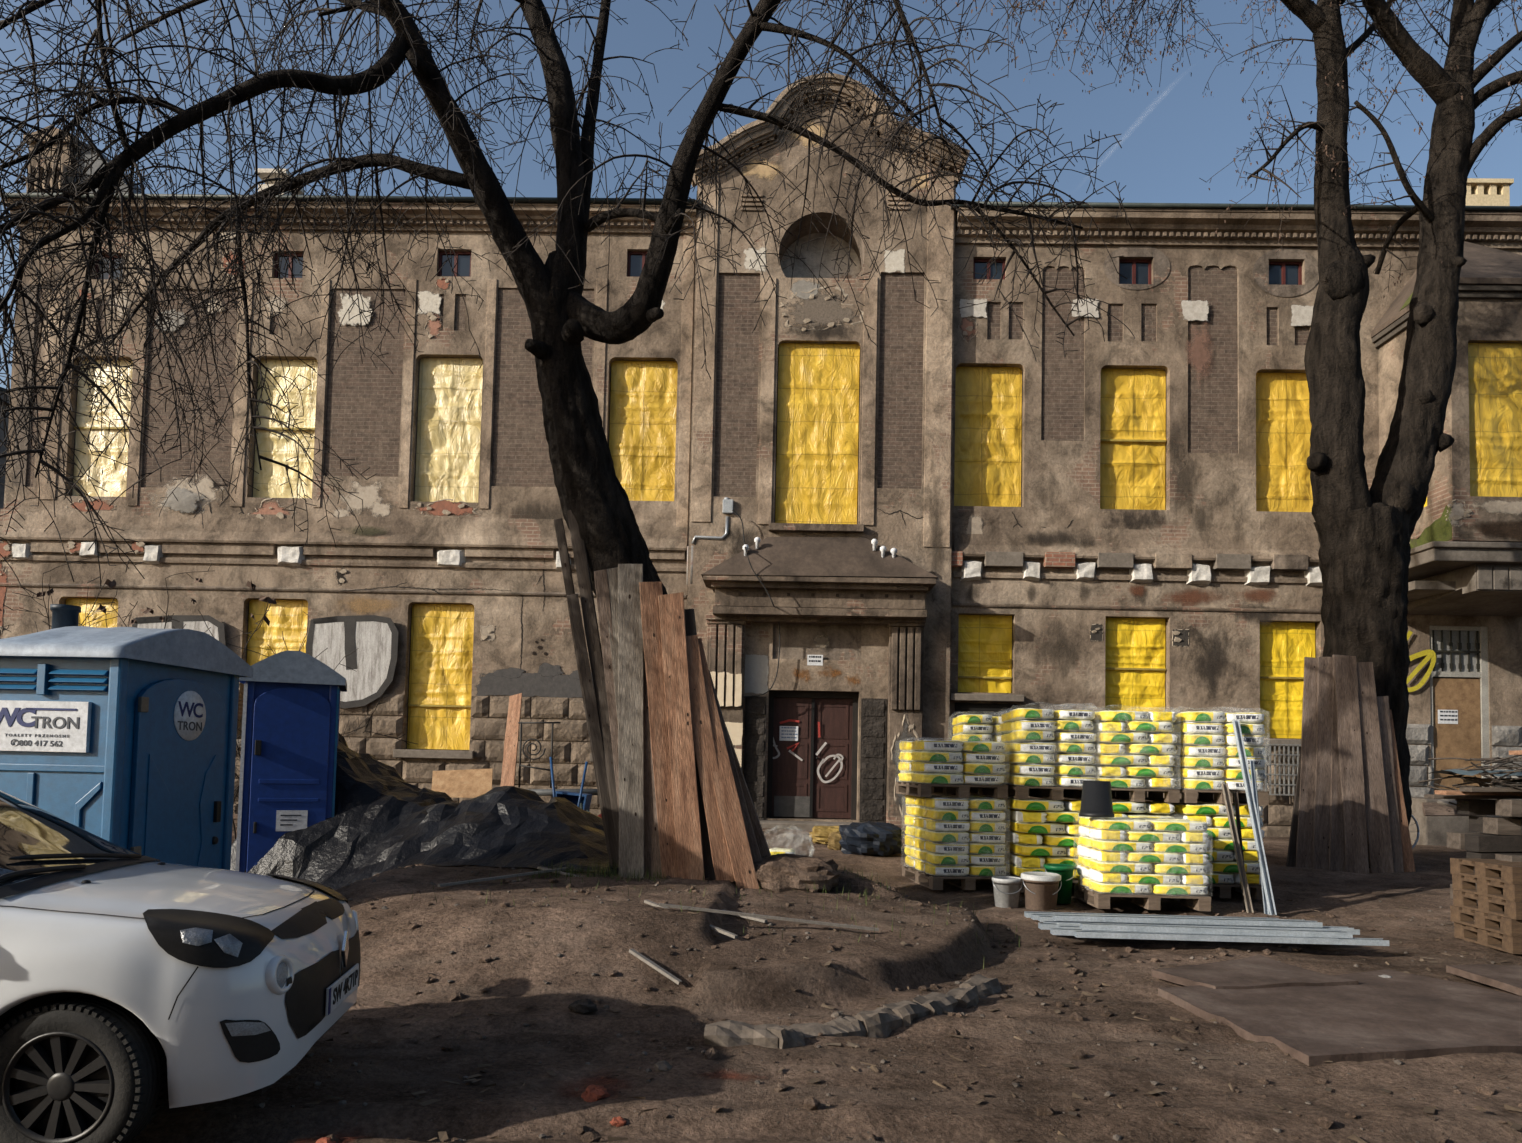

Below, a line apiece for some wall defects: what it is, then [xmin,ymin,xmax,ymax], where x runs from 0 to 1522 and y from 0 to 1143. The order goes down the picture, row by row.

peeling [148,474,223,513]
spalling [247,498,297,519]
peeling [333,481,390,517]